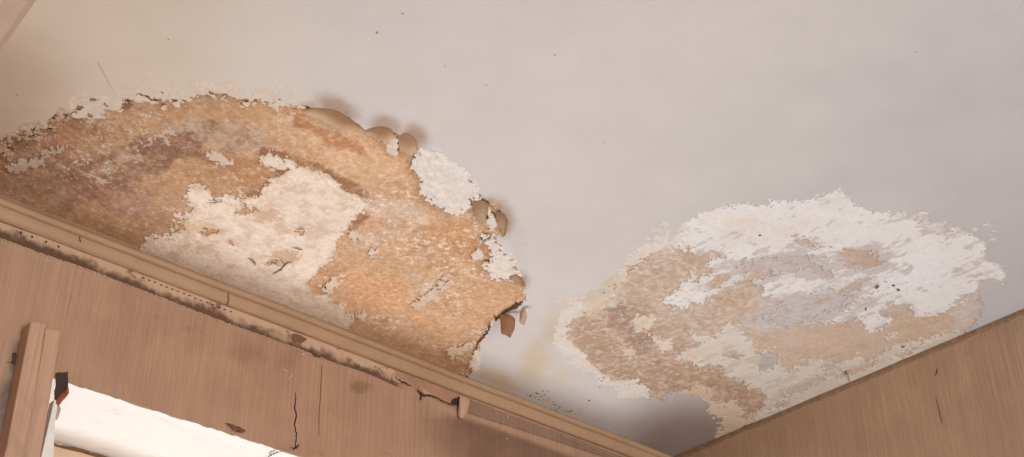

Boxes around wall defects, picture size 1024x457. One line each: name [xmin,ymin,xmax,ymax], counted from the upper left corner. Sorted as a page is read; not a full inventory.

water stain [287,77,445,155]
spalling [0,71,527,377]
peeling [552,186,1006,440]
water stain [202,328,335,391]
crack [268,367,322,457]